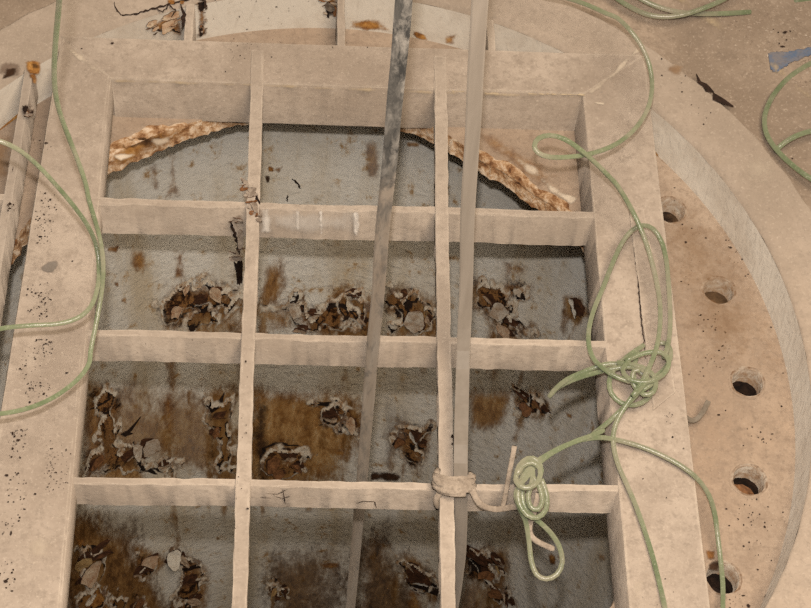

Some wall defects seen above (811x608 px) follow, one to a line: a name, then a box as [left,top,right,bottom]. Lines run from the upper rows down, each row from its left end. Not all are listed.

crack [114,0,207,29]
corrosion [109,122,188,162]
corrosion [479,150,576,211]
peeling [151,177,262,333]
peeling [256,280,371,336]
peeling [384,280,436,337]
peeling [472,275,540,339]
peeling [79,382,185,478]
corrosion [252,387,362,481]
peeling [389,419,437,466]
peeling [74,536,210,608]
peeling [463,545,515,608]